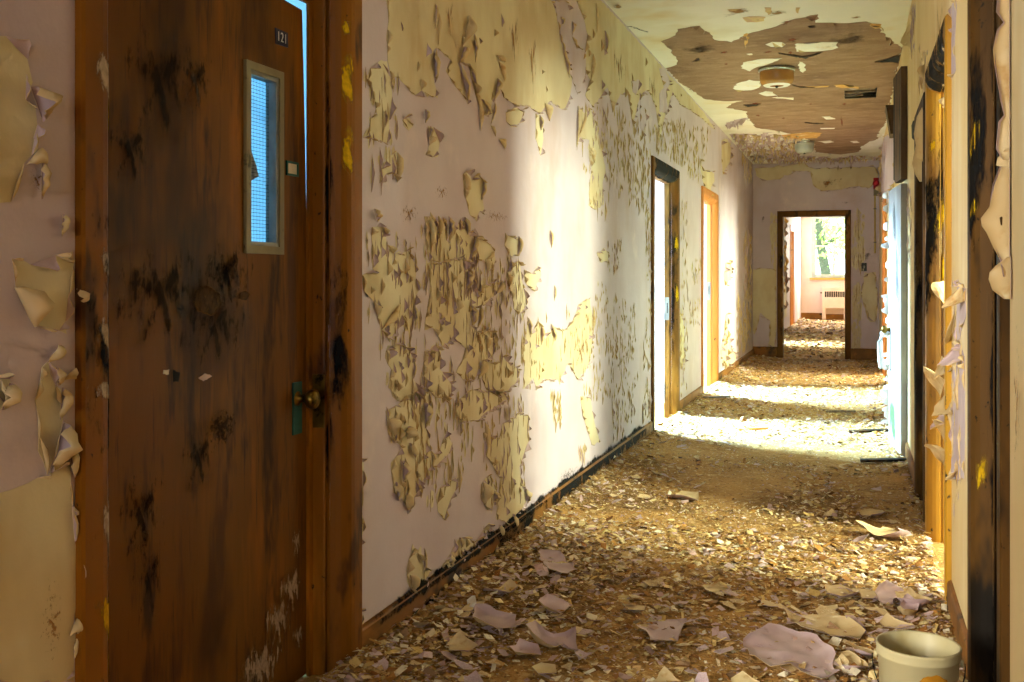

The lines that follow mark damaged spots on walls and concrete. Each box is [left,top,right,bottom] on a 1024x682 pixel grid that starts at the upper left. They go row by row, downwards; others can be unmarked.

peeling [0,36,63,203]
damp [325,83,353,244]
peeling [938,0,957,108]
damp [969,45,997,237]
peeling [981,0,1011,299]
peeling [0,251,90,682]
damp [326,257,349,482]
peeling [362,0,928,593]
peeling [923,279,966,522]
damp [977,290,997,530]